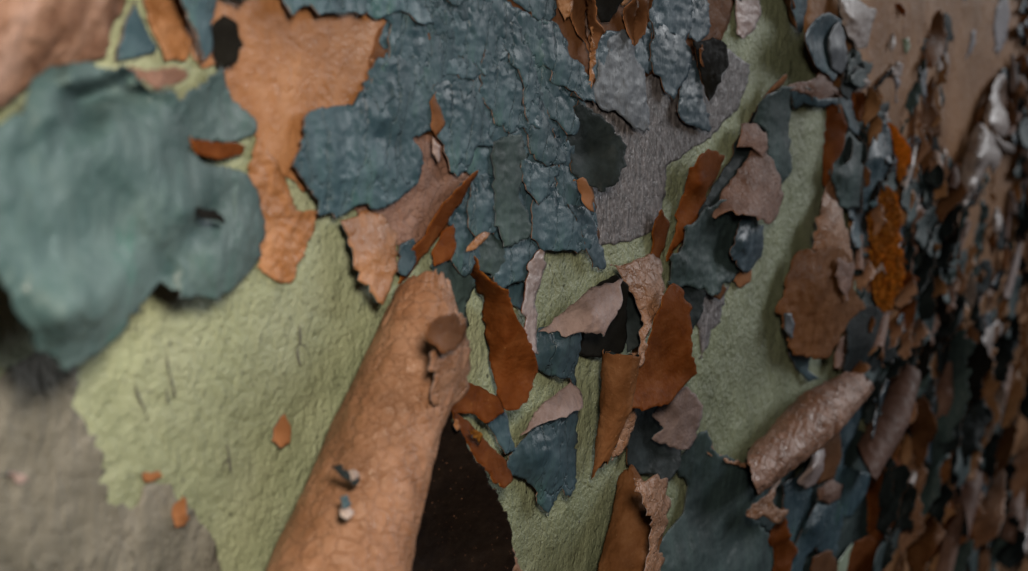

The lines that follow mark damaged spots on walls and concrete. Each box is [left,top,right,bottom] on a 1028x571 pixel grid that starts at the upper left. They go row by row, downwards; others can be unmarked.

peeling [291,0,1028,571]
corrosion [866,122,912,312]